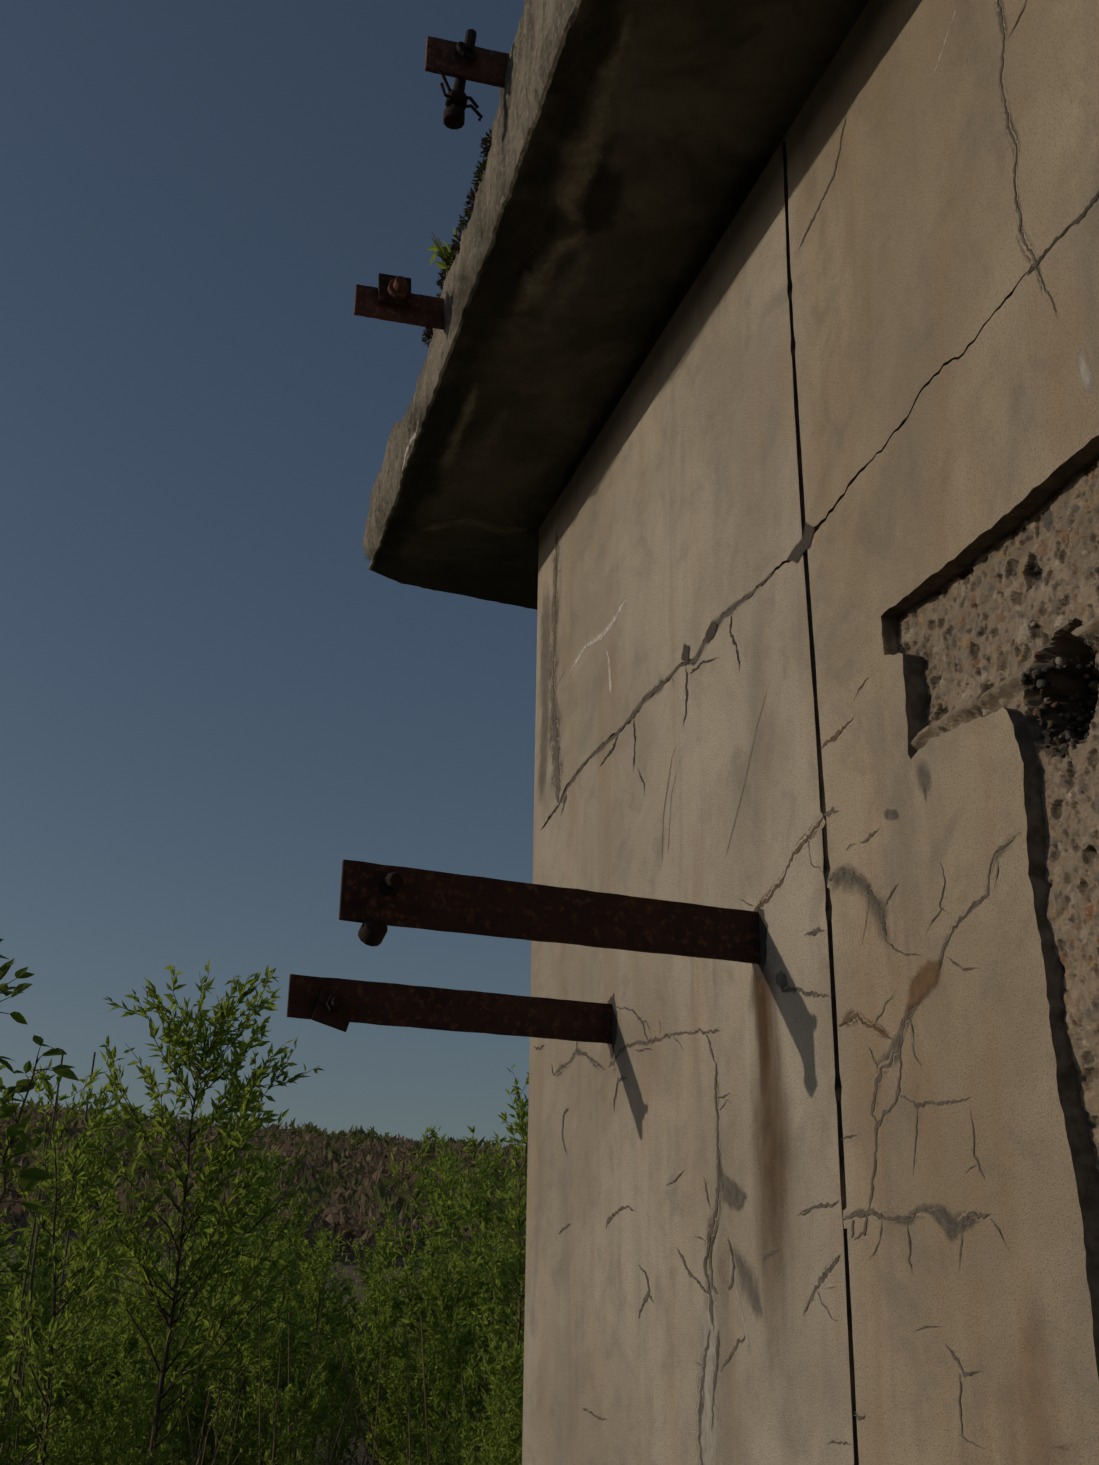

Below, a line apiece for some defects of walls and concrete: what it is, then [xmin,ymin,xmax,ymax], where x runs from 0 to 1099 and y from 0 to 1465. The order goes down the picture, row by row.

water stain [372,0,630,561]
water stain [559,153,772,495]
crack [541,0,1099,830]
spalling [898,457,1099,1172]
crack [533,1006,745,1465]
crack [828,1412,865,1445]
crack [916,1326,984,1449]